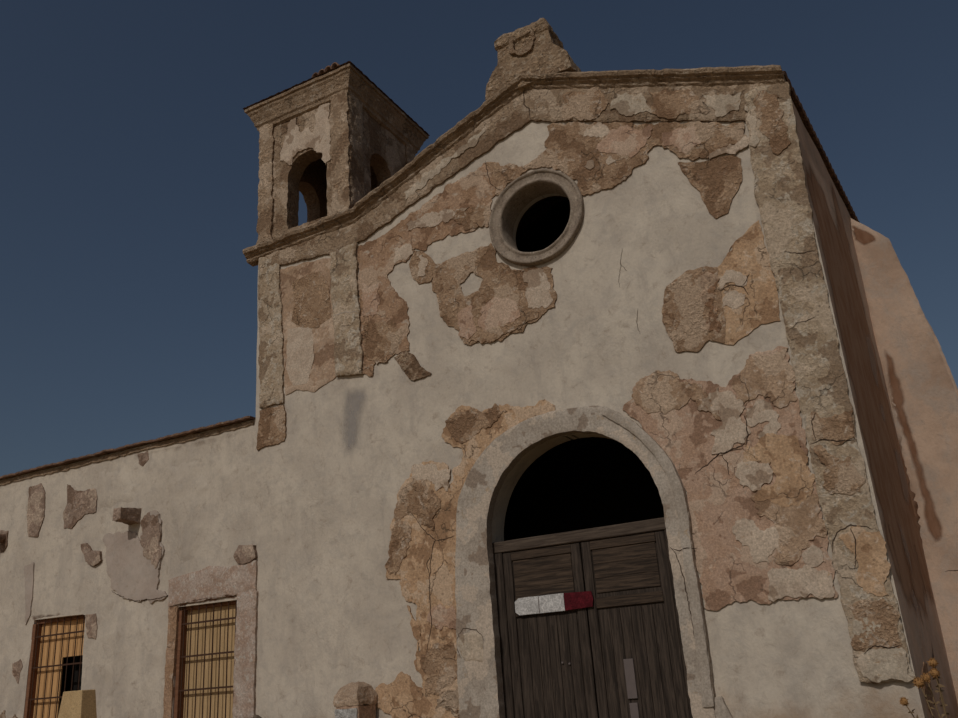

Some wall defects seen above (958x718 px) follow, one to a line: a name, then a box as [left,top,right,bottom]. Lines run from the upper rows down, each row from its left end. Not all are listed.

flaking render [81,510,168,603]
peeling [286,271,332,386]
flaking render [375,399,555,718]
flaking render [357,87,791,381]
flaking render [623,346,932,713]
leakage [807,169,933,623]